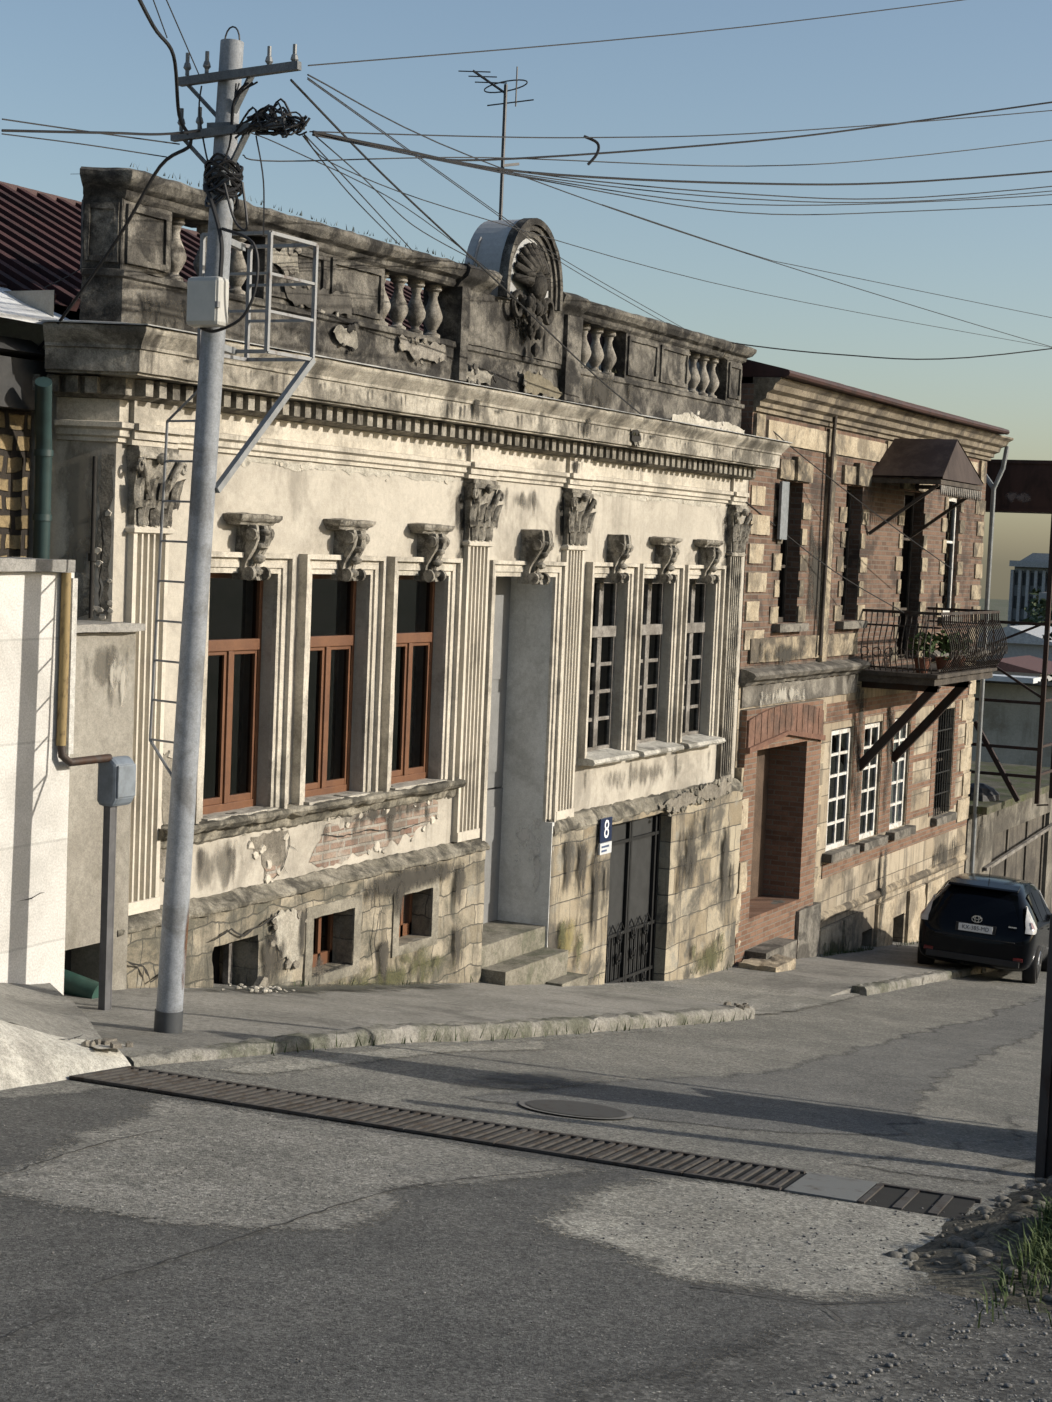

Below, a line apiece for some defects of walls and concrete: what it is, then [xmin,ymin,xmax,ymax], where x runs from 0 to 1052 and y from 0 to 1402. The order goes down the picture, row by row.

spalling [272,247,359,352]
peeling [399,334,447,365]
spalling [672,411,745,434]
water stain [95,650,126,703]
water stain [198,842,236,886]
spalling [247,827,289,884]
spalling [309,799,439,868]
water stain [678,810,734,910]
peeling [270,908,308,969]
crack [127,961,158,989]